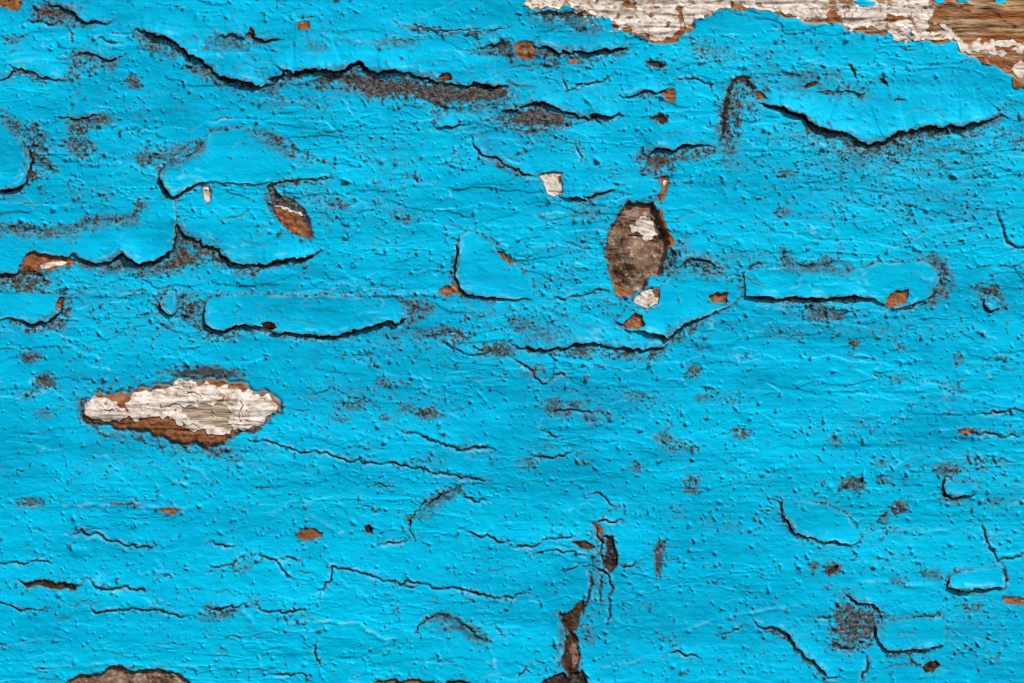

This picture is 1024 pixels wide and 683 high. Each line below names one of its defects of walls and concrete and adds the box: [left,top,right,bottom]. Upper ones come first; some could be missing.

peeling [128,8,1017,202]
peeling [0,124,333,325]
peeling [630,216,659,241]
peeling [511,245,945,353]
peeling [83,378,280,449]
crack [323,566,527,599]
peeling [574,523,618,573]
peeling [68,666,189,683]
peeling [542,601,587,683]